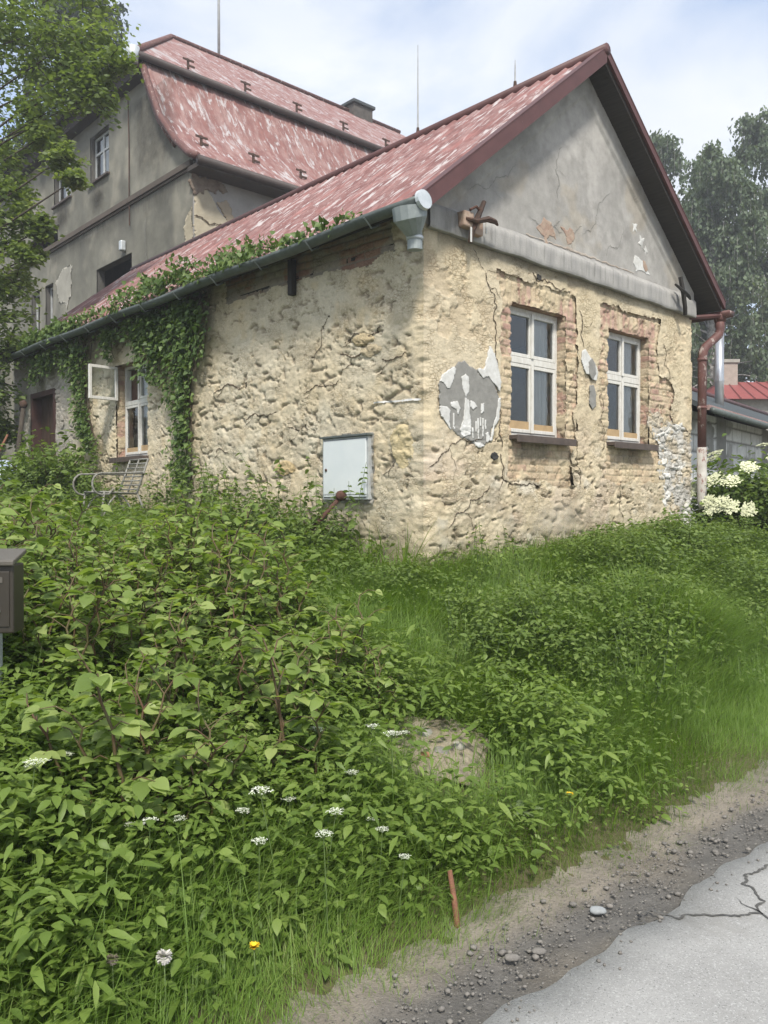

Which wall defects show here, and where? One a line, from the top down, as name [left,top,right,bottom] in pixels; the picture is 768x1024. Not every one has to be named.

peeling [55,265,73,309]
peeling [183,173,234,242]
crack [473,248,566,362]
spalling [526,217,650,275]
crack [304,316,405,399]
spalling [438,268,693,529]
crack [430,391,542,529]